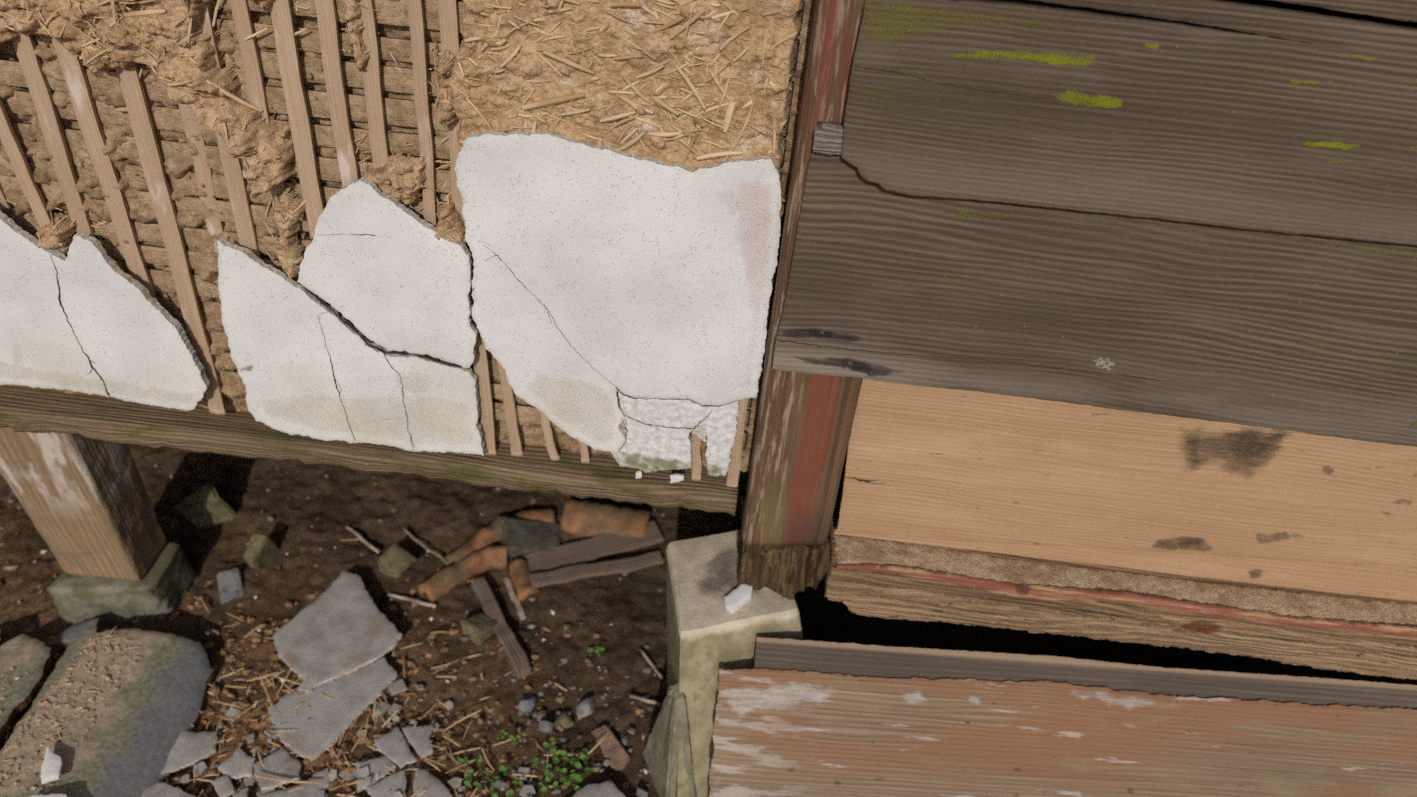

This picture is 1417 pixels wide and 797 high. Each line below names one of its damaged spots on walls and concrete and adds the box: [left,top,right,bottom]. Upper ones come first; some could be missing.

spalling [336,0,394,72]
spalling [0,0,308,284]
spalling [353,134,472,253]
spalling [428,0,804,217]
crack [50,255,110,396]
crack [300,241,735,451]
peeling [612,389,739,483]